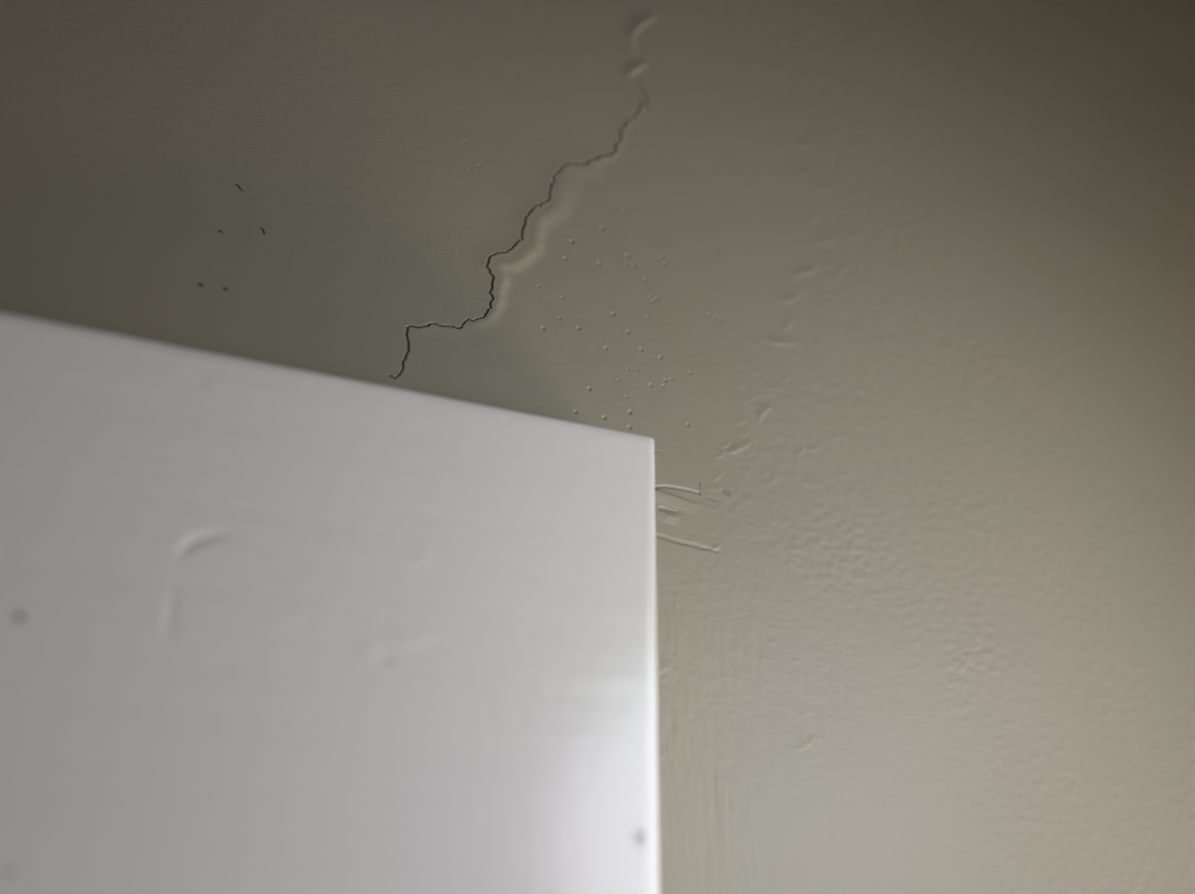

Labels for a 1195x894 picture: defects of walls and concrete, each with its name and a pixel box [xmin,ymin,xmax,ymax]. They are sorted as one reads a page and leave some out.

crack [366,4,672,392]
crack [654,443,736,561]